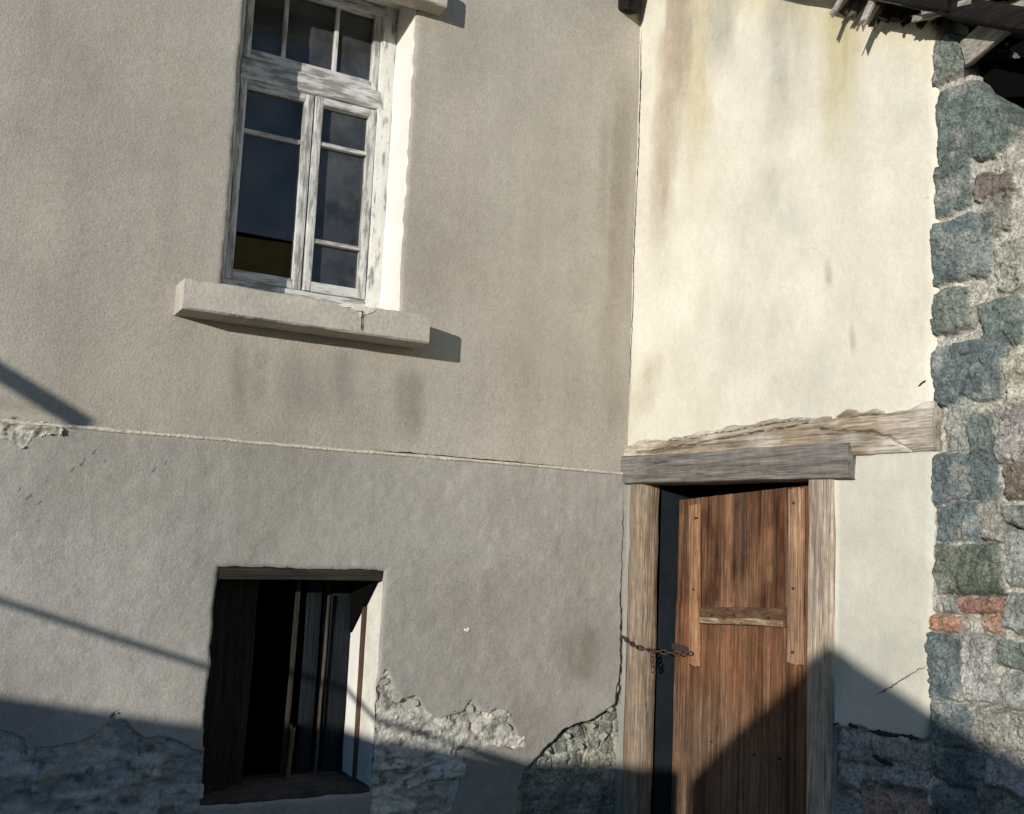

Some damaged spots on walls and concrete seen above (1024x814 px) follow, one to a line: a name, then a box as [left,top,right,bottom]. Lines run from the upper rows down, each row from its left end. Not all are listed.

peeling [0,418,63,449]
crack [615,494,624,703]
crack [877,665,927,695]
spalling [0,711,204,814]
spalling [370,670,525,814]
spalling [516,695,619,814]